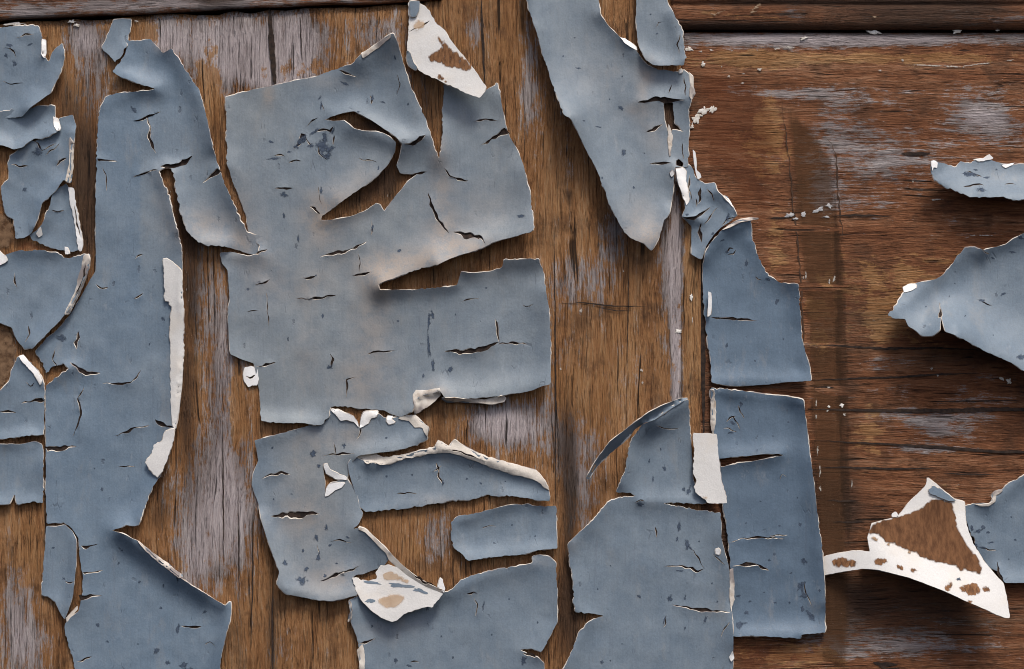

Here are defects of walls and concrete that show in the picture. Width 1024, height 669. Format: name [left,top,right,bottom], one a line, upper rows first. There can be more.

peeling [0,0,558,669]
peeling [526,0,1024,669]